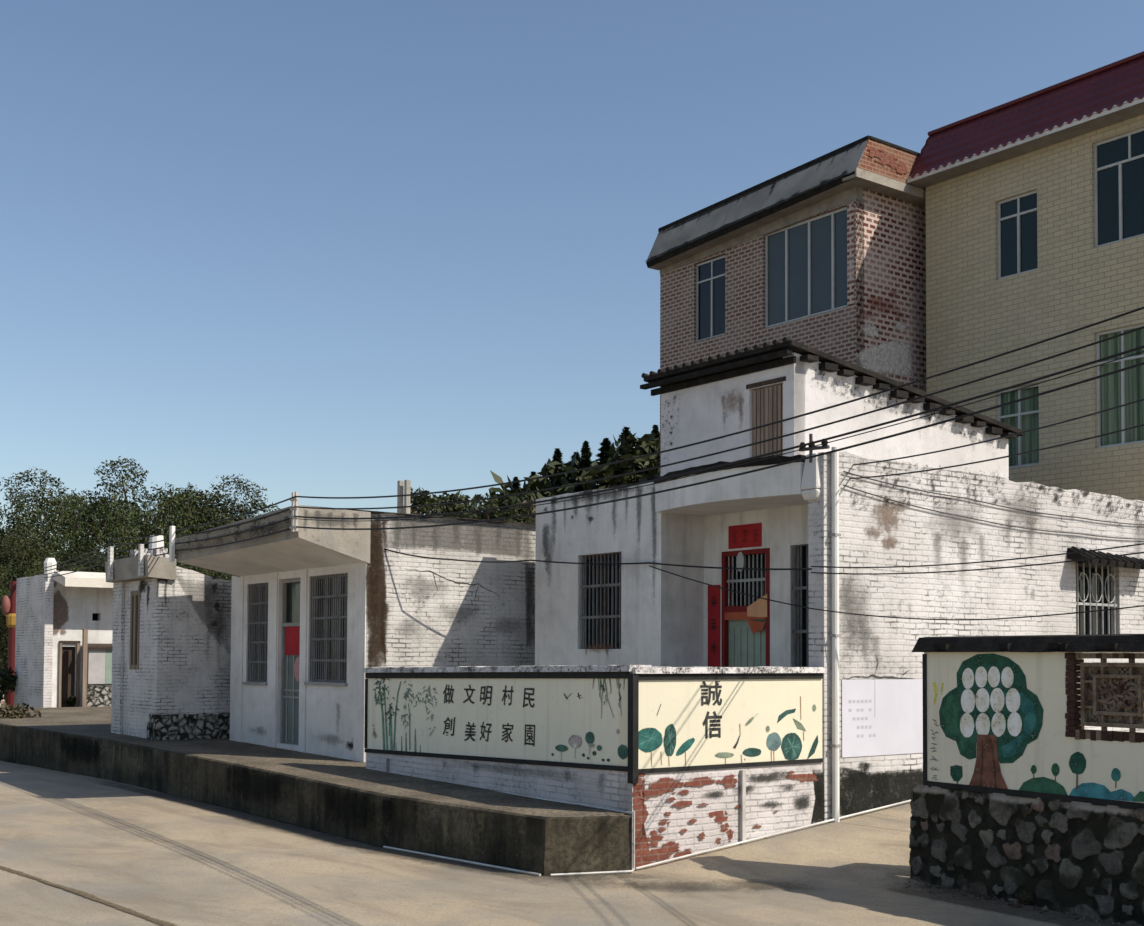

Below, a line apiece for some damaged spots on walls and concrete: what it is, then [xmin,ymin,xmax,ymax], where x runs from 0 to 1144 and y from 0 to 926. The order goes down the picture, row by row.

leakage [305,478,656,667]
peeling [632,773,741,868]
peeling [786,771,818,782]